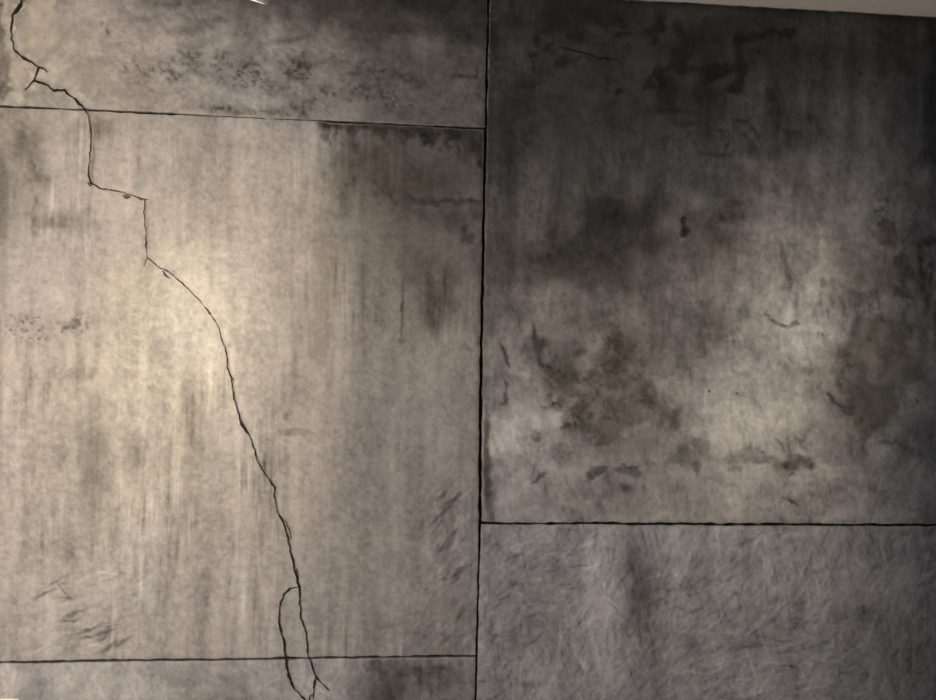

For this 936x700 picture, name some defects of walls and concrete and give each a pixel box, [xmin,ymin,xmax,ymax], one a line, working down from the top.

damp [320,123,483,198]
crack [10,0,329,700]
damp [545,334,679,444]
damp [836,310,922,438]